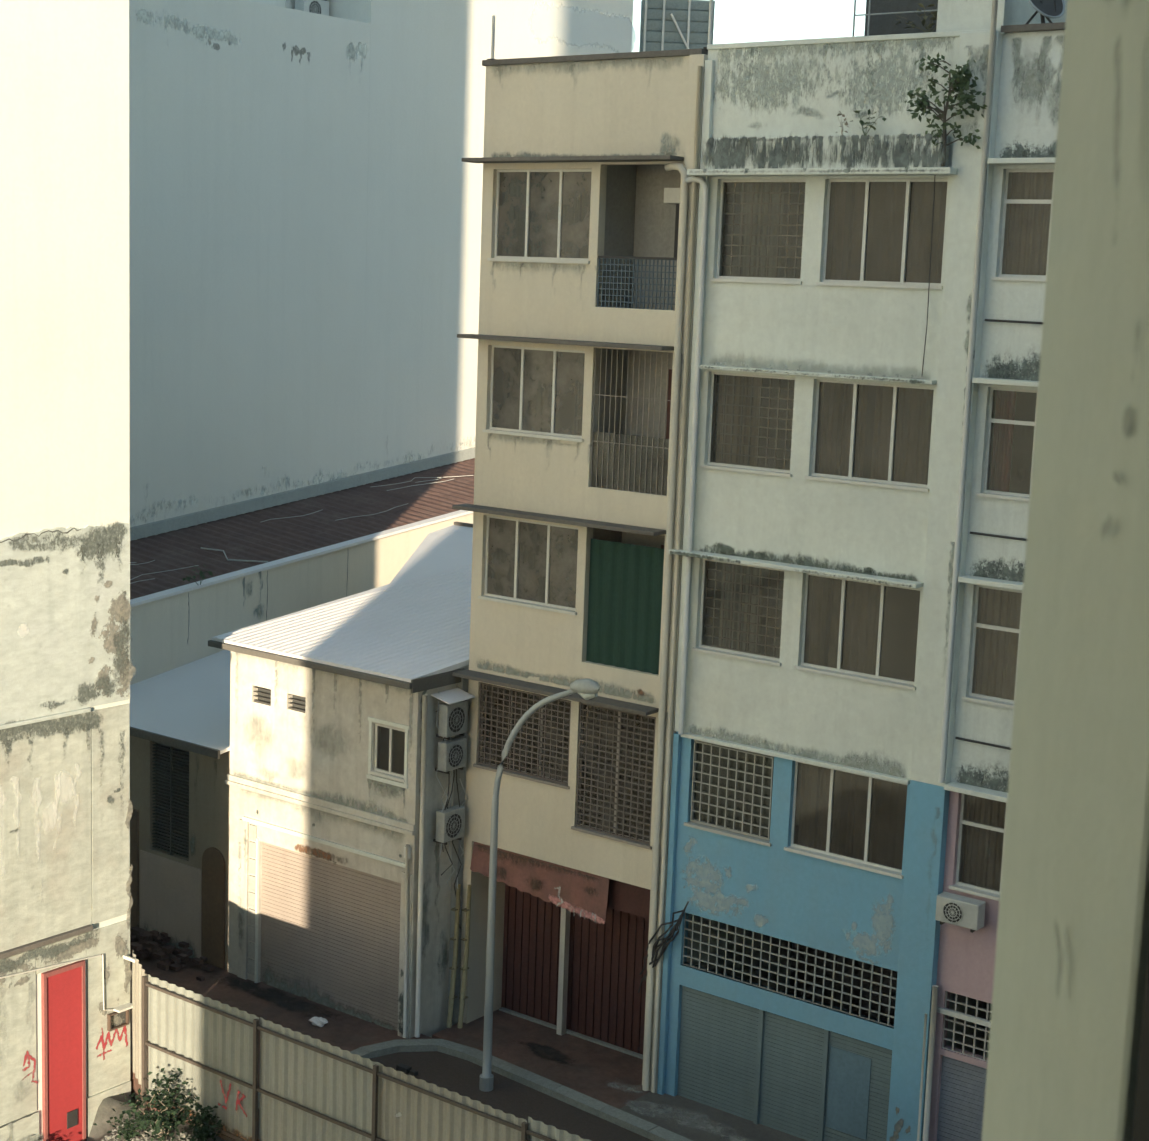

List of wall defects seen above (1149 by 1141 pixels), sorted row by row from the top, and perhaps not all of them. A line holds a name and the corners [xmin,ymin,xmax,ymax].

water stain [282,43,310,62]
water stain [1013,36,1065,119]
water stain [702,133,944,173]
water stain [1000,142,1057,158]
flaking render [0,523,136,725]
water stain [0,618,131,764]
corrosion [295,844,342,863]